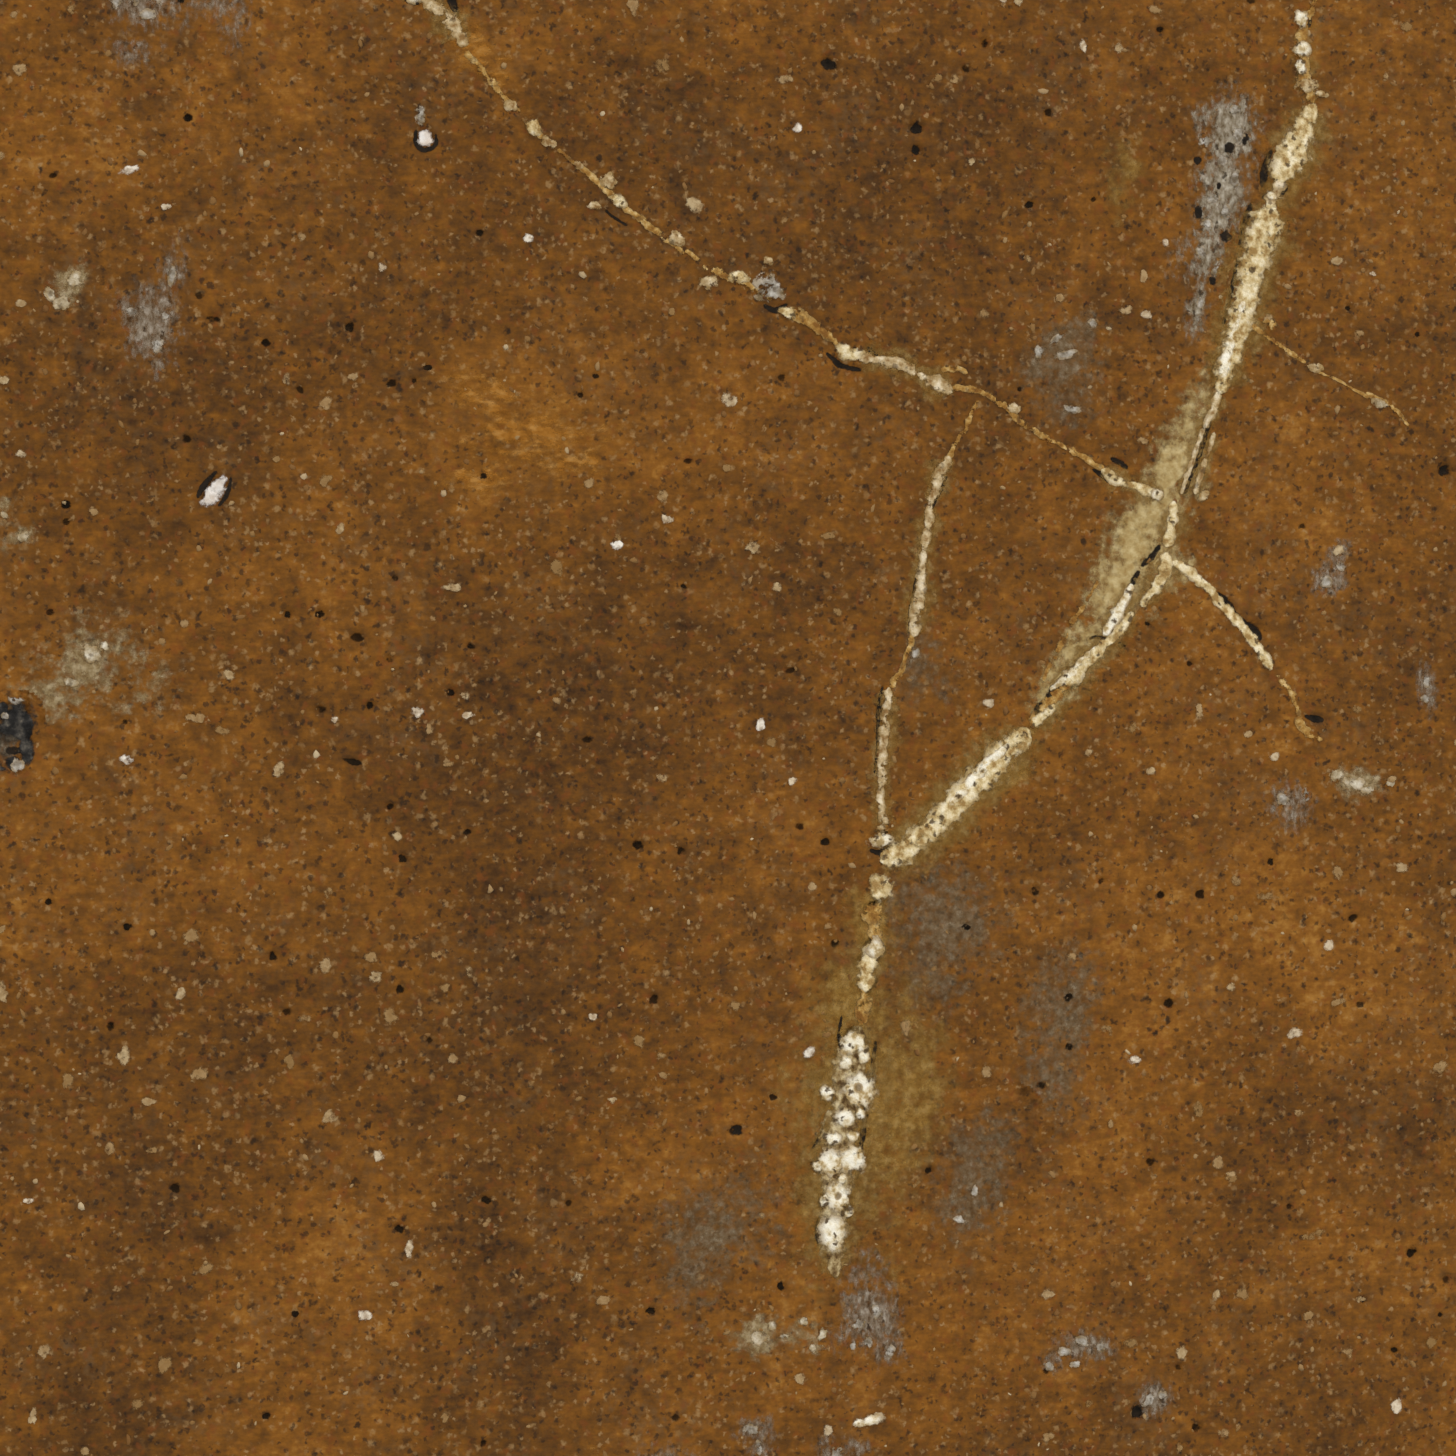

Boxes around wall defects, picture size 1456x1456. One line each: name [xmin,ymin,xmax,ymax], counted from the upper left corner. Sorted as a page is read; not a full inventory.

crack [405,0,1409,1278]
water stain [895,369,1210,857]
water stain [800,873,983,1220]